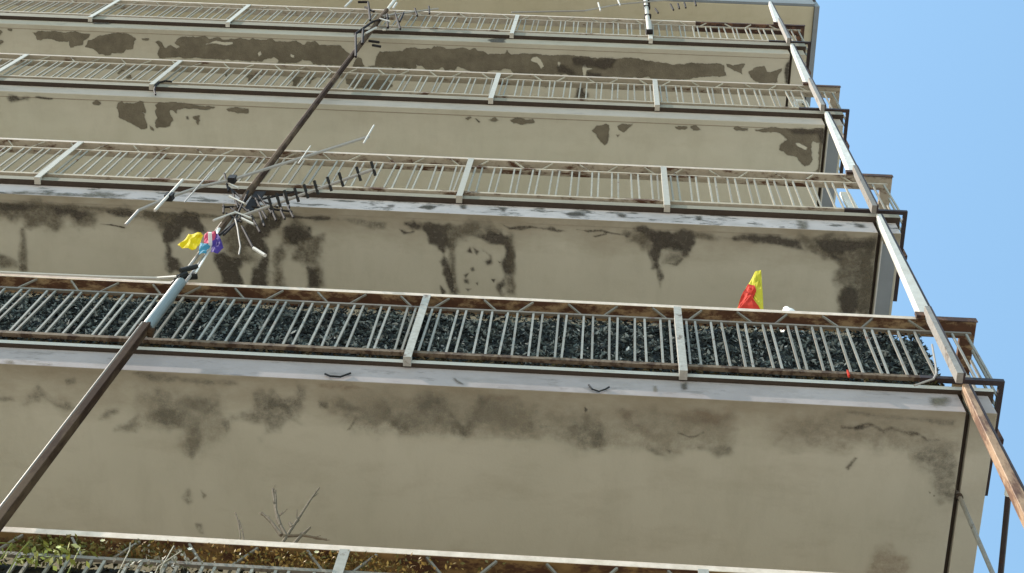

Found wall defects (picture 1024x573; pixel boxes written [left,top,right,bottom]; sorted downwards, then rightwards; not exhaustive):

spalling [34,31,782,98]
spalling [117,101,249,131]
spalling [592,124,632,145]
spalling [734,127,824,172]
leakage [214,213,329,287]
leakage [401,222,525,294]
leakage [625,226,713,281]
leakage [733,221,876,314]